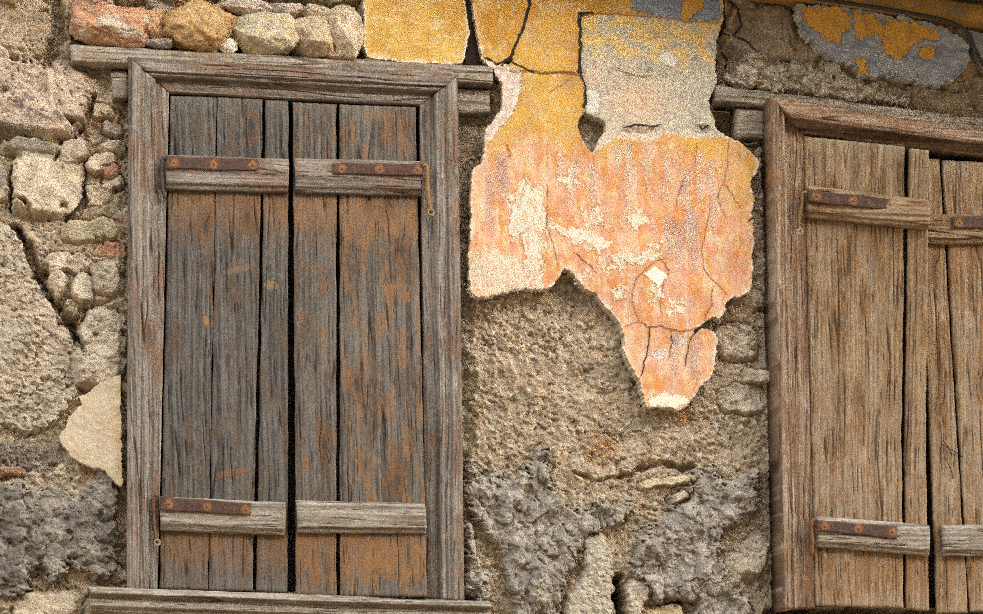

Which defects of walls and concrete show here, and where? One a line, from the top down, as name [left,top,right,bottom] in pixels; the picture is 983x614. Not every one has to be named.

crack [465,0,594,108]
crack [715,0,759,73]
peeling [792,3,983,90]
crack [623,122,660,130]
peeling [361,0,760,413]
crack [546,185,596,272]
crack [627,124,755,376]